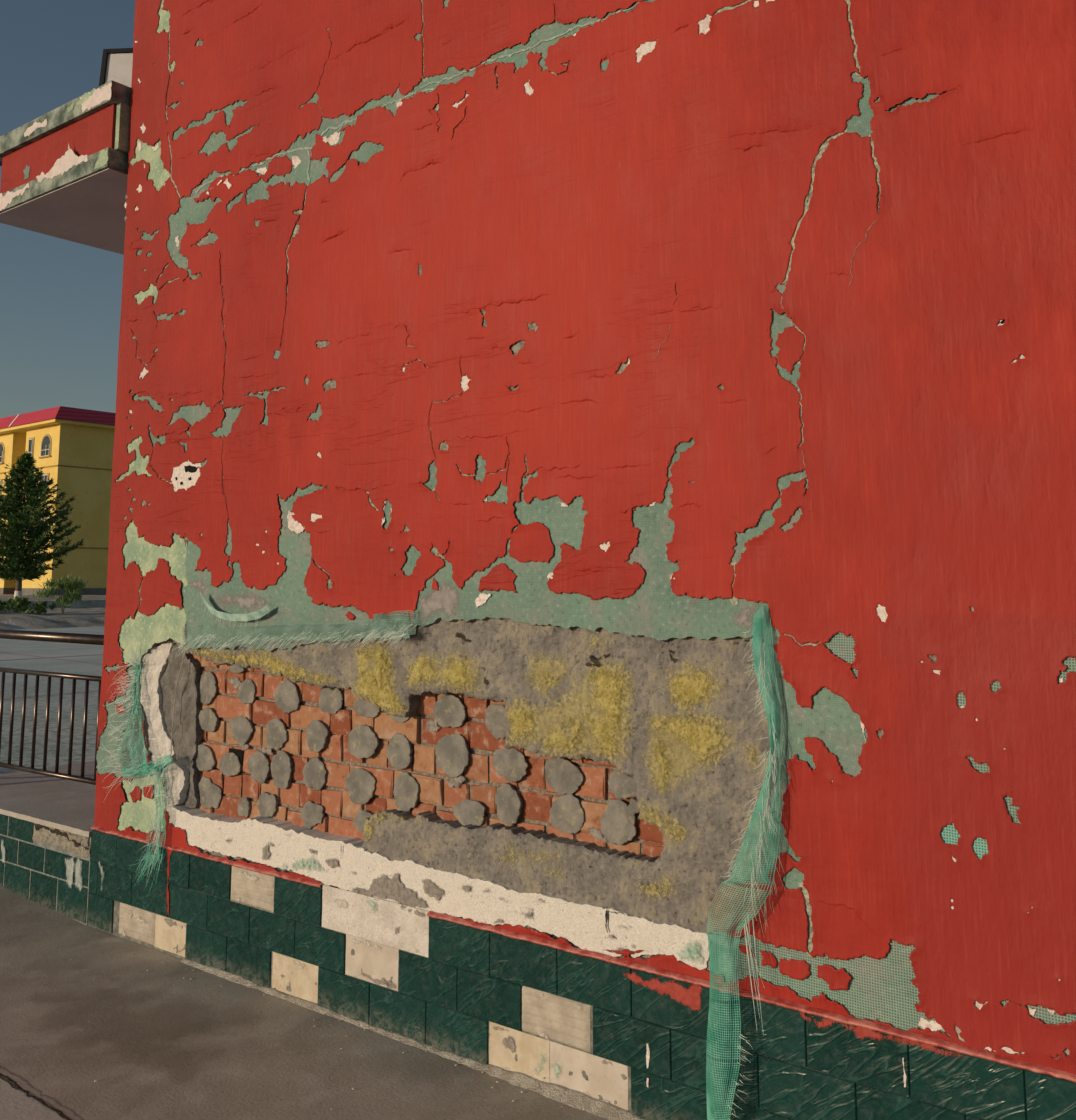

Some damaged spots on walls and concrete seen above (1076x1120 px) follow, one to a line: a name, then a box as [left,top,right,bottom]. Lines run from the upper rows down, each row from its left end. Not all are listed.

peeling [698,0,775,34]
peeling [67,82,112,112]
peeling [24,119,47,137]
peeling [124,0,656,305]
peeling [0,144,108,211]
crack [770,0,955,448]
peeling [1057,657,1076,684]
peeling [96,367,966,1042]
peeling [966,756,990,773]